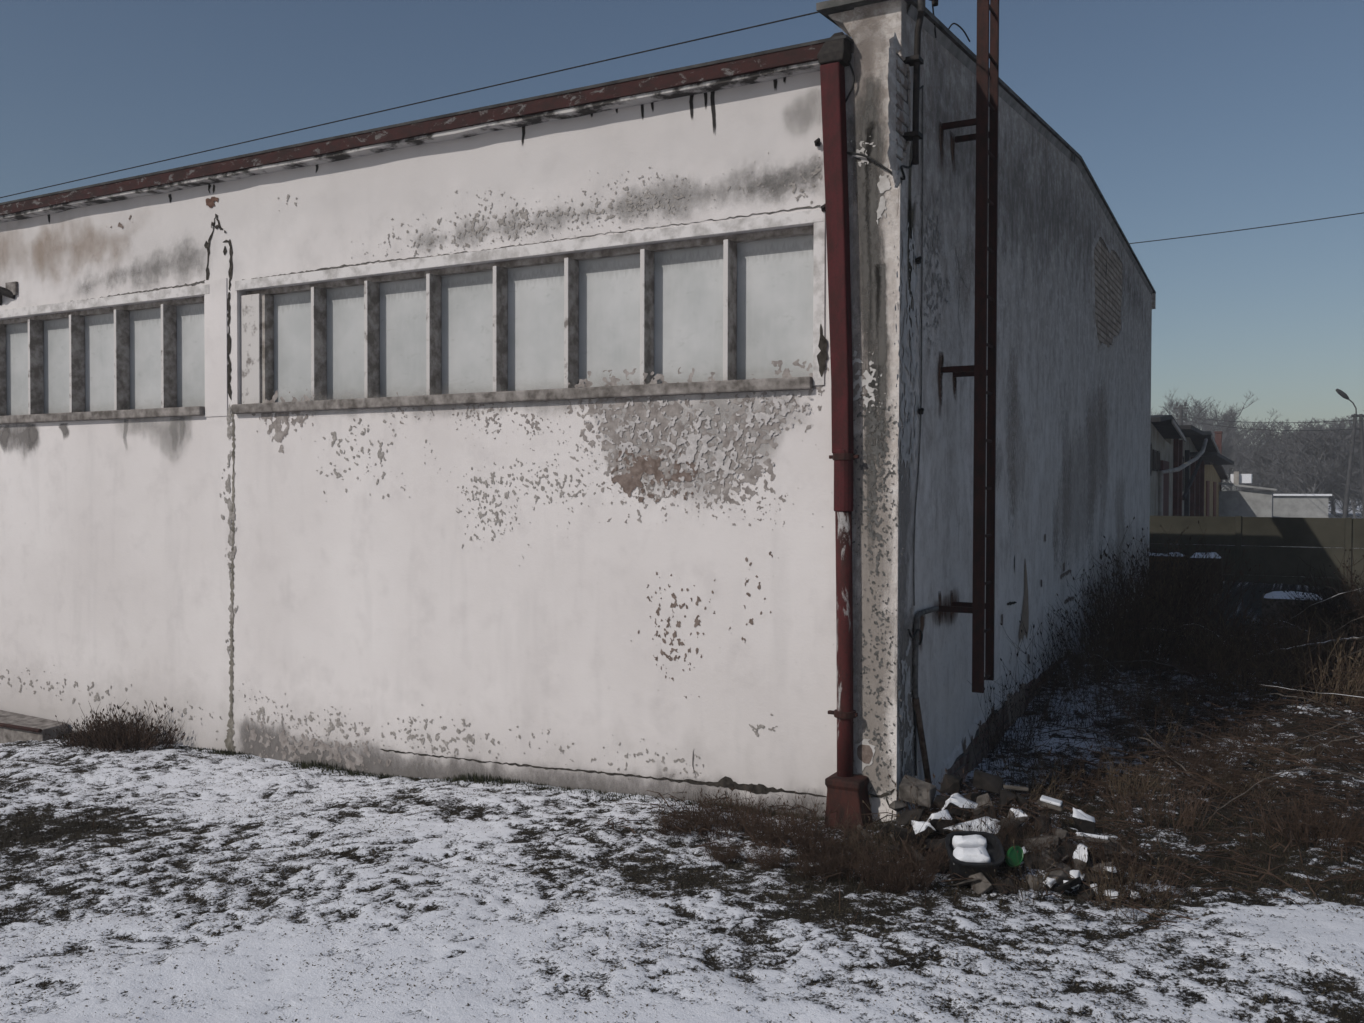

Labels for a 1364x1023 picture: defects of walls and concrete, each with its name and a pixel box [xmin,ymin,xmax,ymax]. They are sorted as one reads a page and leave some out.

water stain [351,152,823,263]
flaking render [1091,229,1123,355]
peeling [220,406,237,581]
crack [77,184,821,751]
peeling [252,359,829,548]
peeling [225,604,238,656]
peeling [638,572,715,680]
peeling [729,557,771,641]
corrosion [900,592,959,777]
flaking render [942,560,1072,796]